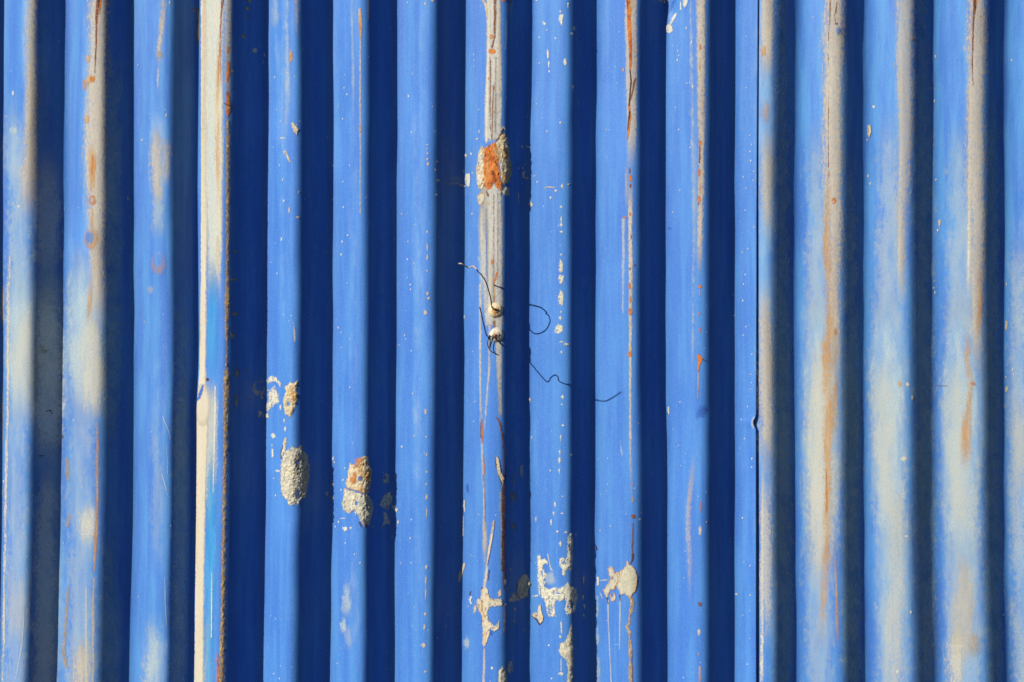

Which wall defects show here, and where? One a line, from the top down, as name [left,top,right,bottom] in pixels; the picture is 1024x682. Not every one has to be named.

rust [476,127,513,205]
rust [216,46,233,682]
peeling [253,376,286,457]
peeling [468,489,525,682]
peeling [532,554,638,624]